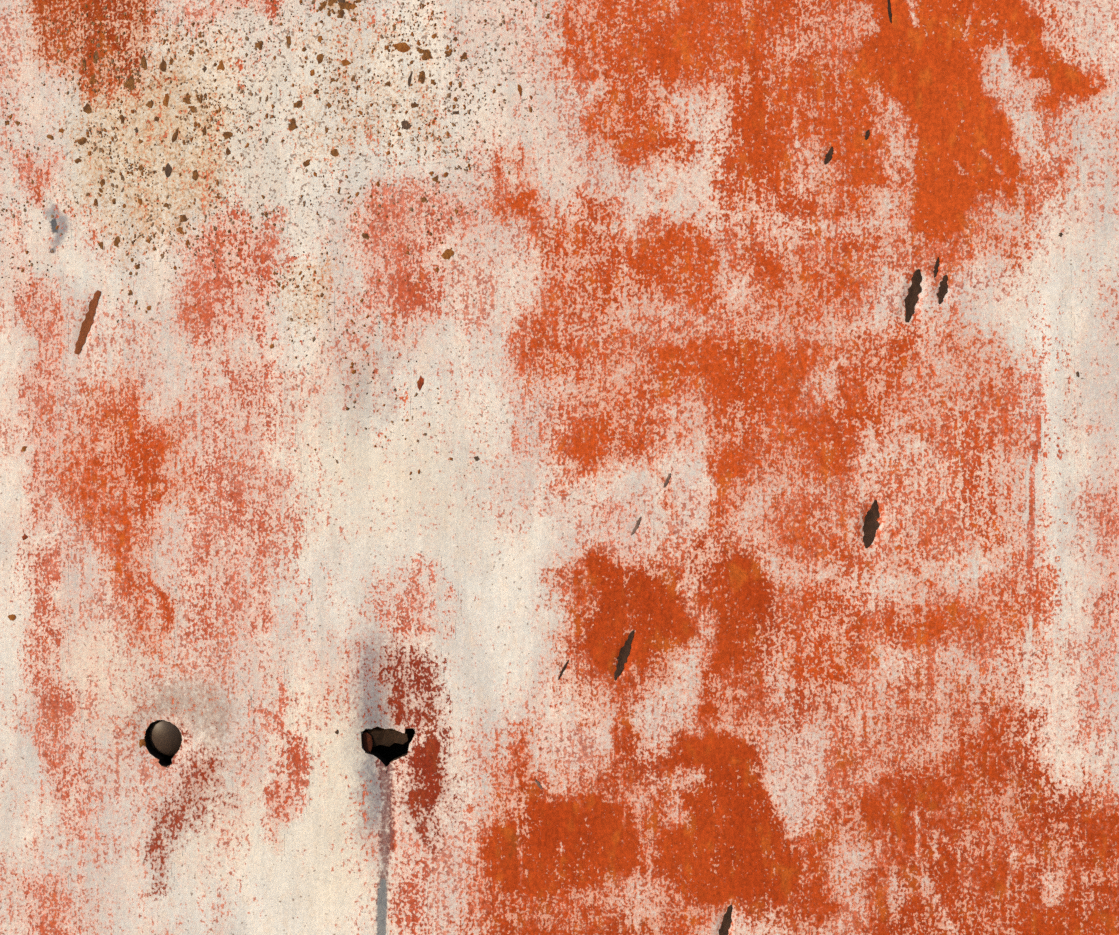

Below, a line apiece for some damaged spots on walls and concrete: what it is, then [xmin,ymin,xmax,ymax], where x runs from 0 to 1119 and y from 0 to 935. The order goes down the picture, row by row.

rust [0,239,207,851]
rust [1,0,537,412]
water stain [374,760,397,935]
rust [388,0,1119,935]